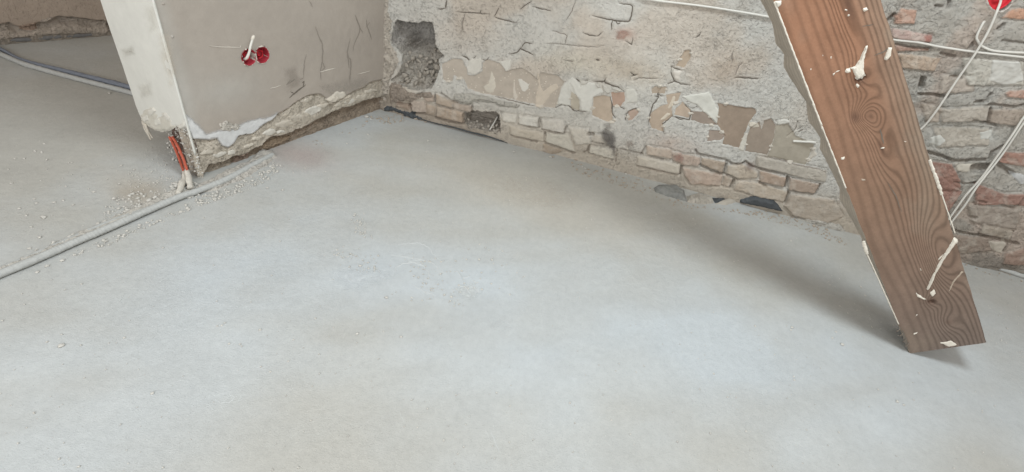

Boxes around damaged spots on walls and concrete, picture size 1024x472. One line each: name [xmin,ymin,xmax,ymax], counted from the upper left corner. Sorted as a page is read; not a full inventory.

crack [286,1,372,97]
flaking render [141,0,816,178]
crack [440,0,692,133]